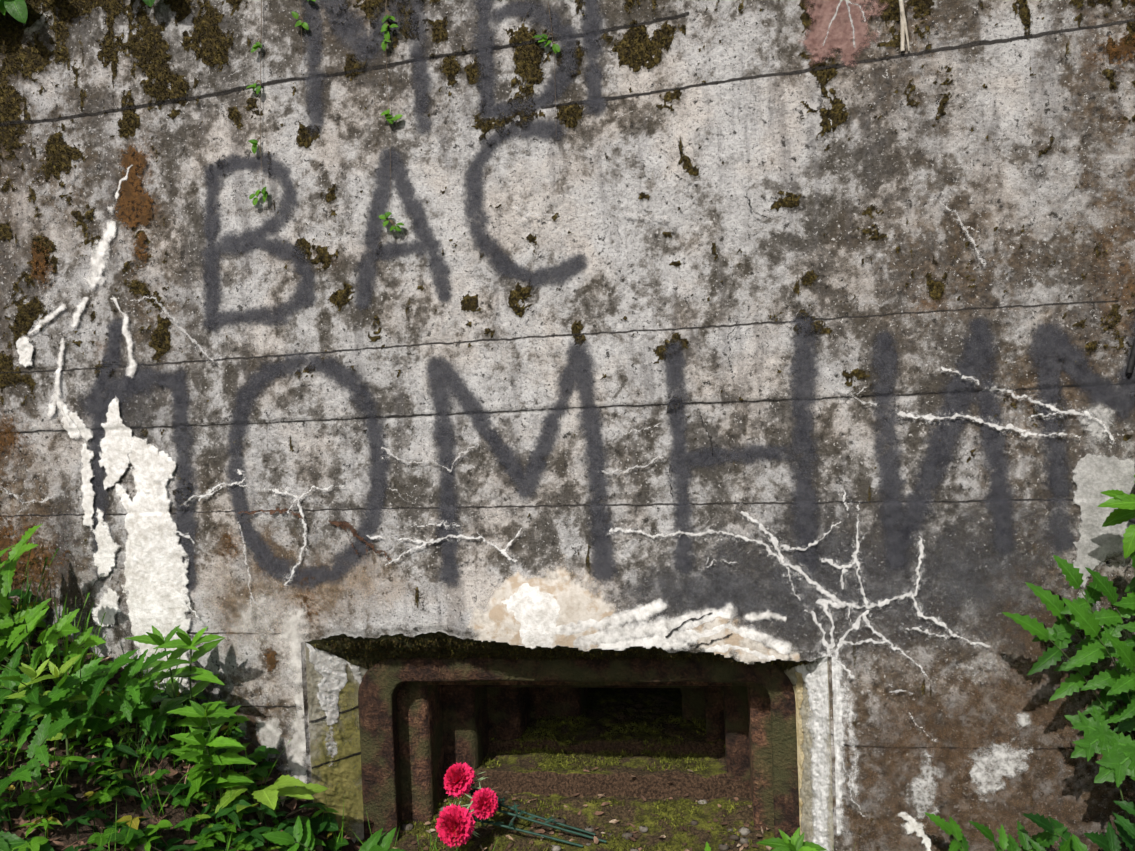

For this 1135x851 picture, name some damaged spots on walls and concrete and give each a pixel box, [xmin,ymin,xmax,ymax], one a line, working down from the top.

rust [114,144,154,280]
crack [835,366,1114,440]
crack [381,443,478,472]
crack [603,455,673,497]
crack [184,469,522,632]
spalling [468,567,800,664]
crack [609,488,990,742]
crack [841,758,865,817]